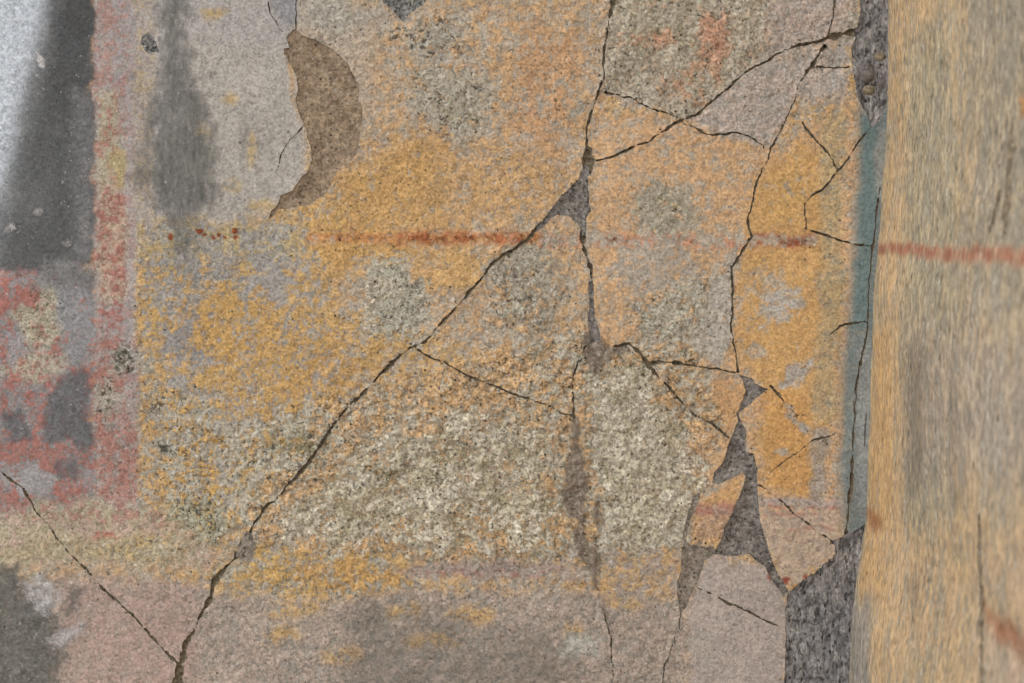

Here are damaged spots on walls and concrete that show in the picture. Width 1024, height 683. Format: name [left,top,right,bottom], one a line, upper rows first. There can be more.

damp [137,0,214,225]
spalling [269,27,363,219]
corrosion [195,228,238,239]
crack [579,233,593,279]
crack [582,0,880,544]
crack [4,223,586,683]
damp [0,565,83,683]
crack [603,609,614,675]
crack [698,588,777,625]